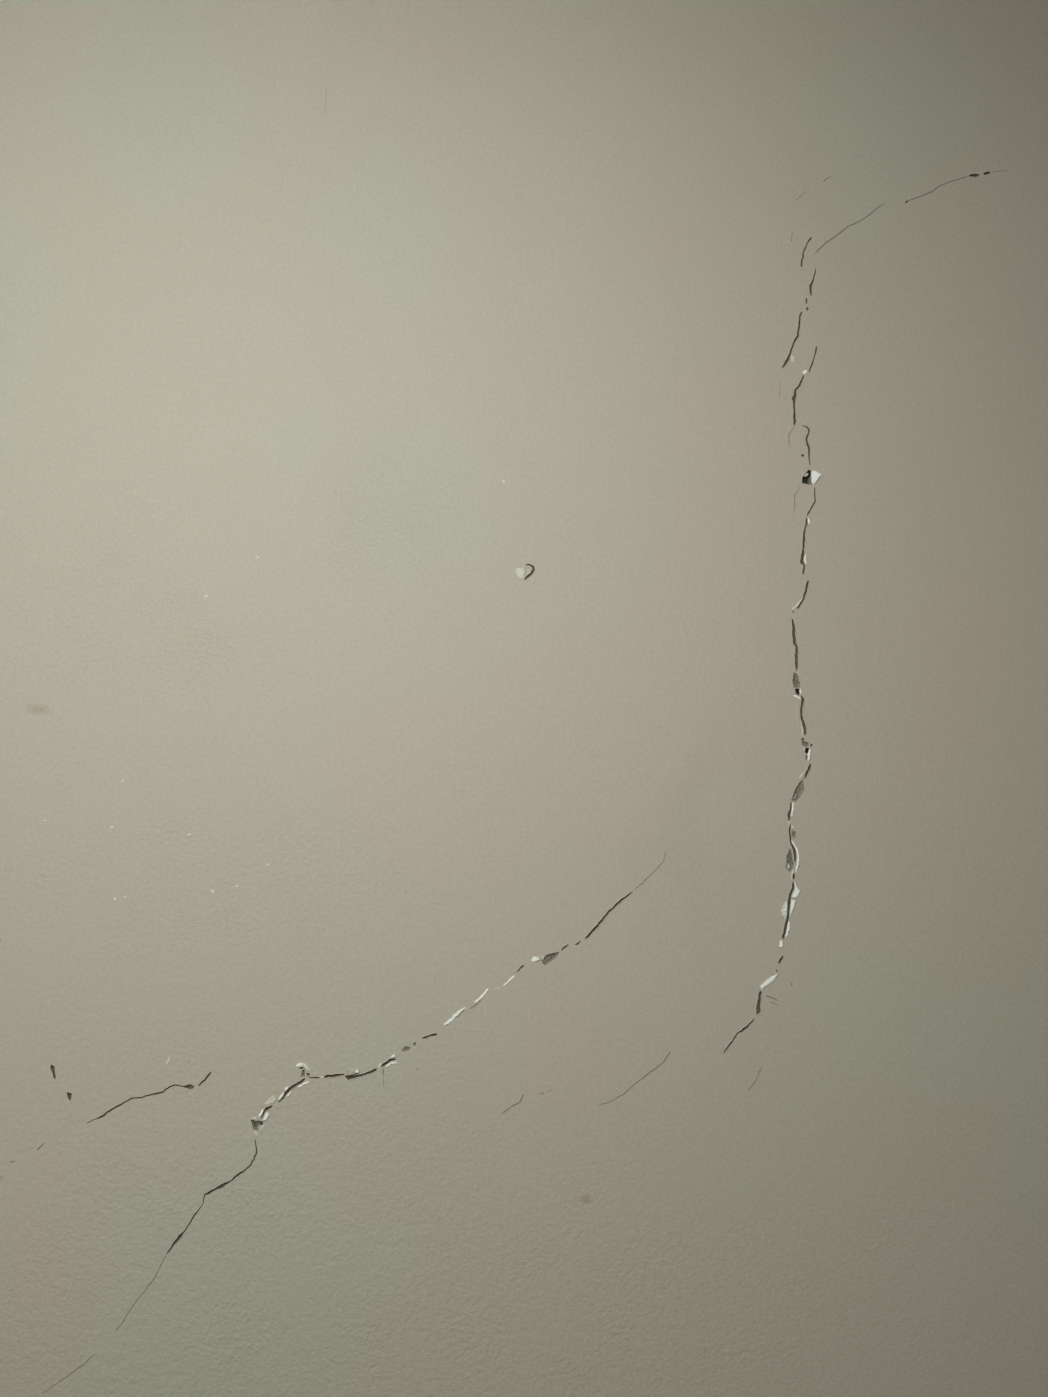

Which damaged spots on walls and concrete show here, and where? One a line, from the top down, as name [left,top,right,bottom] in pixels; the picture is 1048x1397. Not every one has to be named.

crack [723,170,1008,1054]
crack [43,851,671,1393]